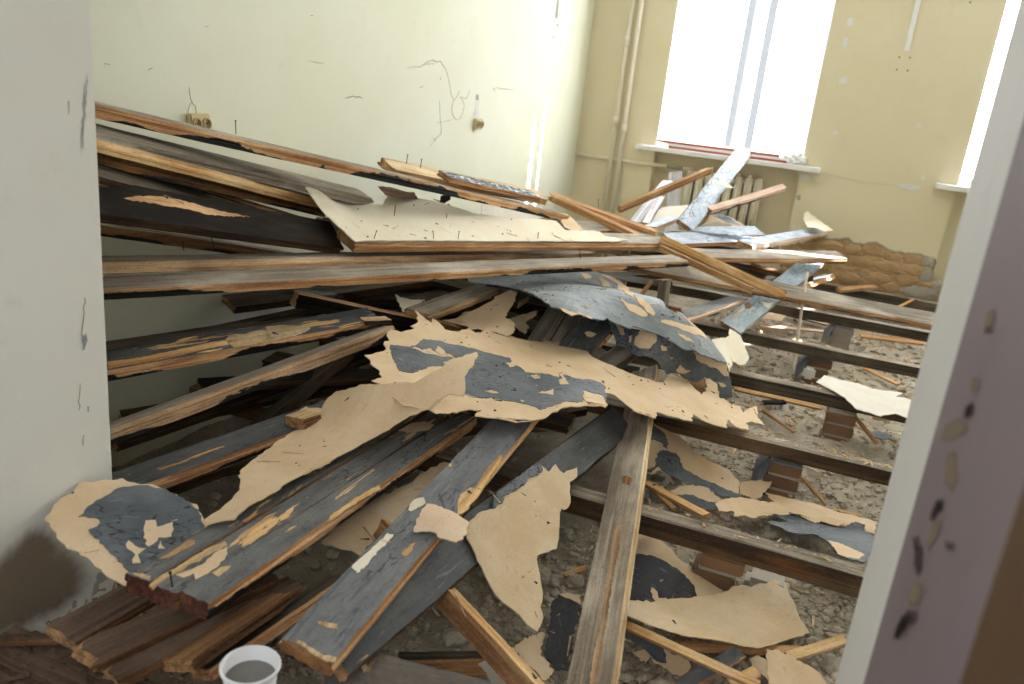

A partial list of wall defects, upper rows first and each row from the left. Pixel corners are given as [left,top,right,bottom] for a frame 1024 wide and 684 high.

crack [407,59,513,145]
flaking render [780,237,943,302]
spalling [942,378,980,440]
spalling [893,500,953,640]